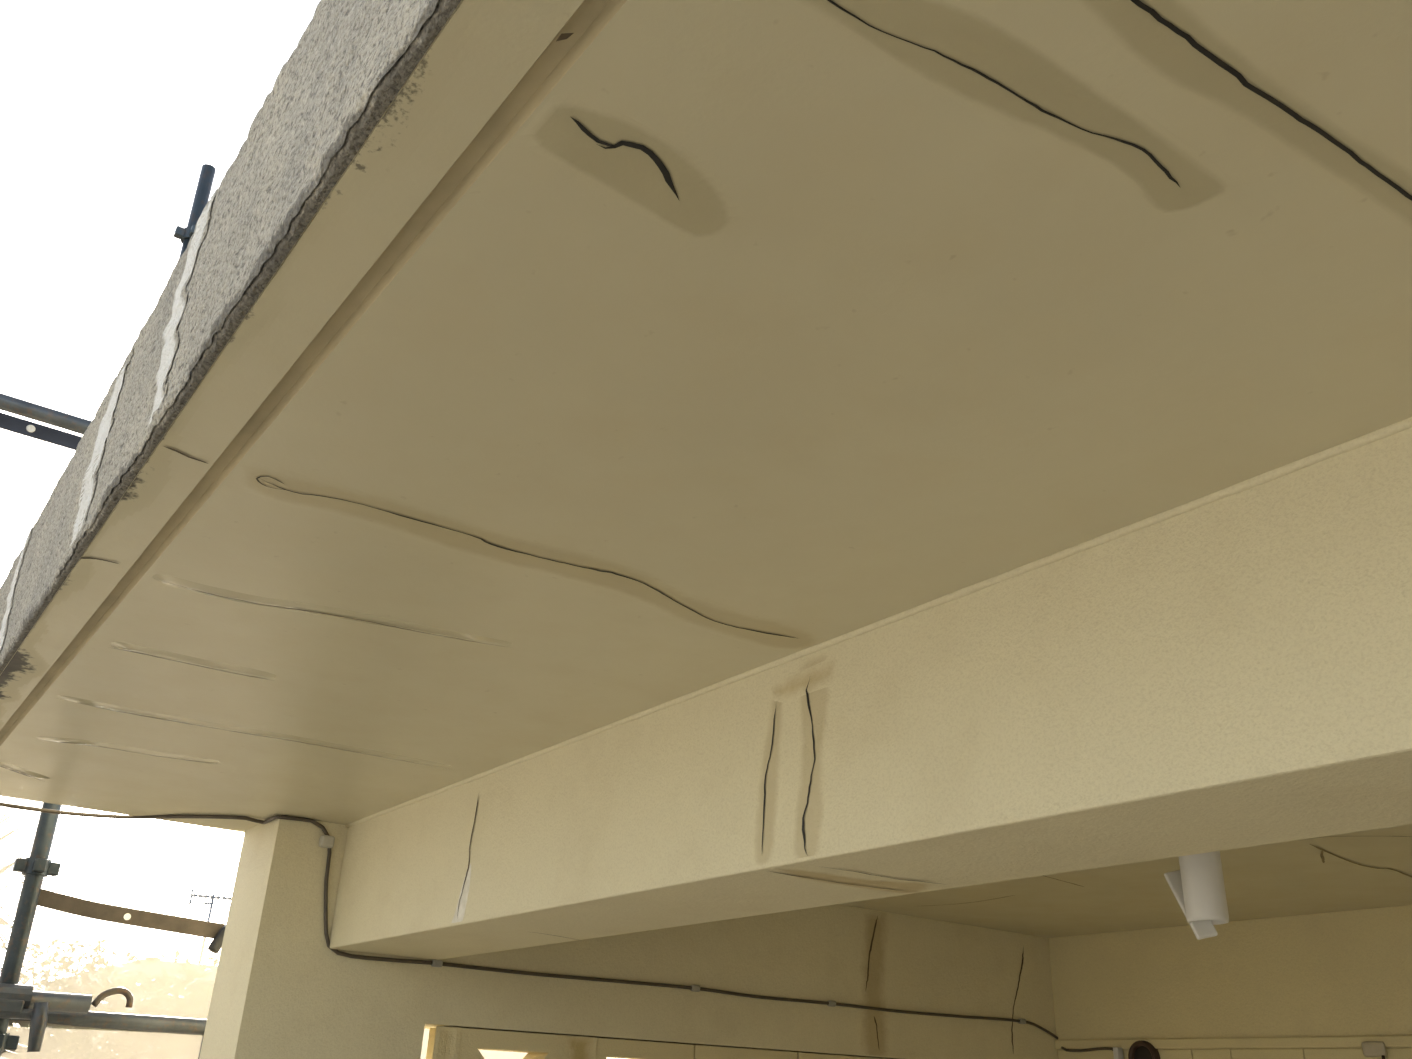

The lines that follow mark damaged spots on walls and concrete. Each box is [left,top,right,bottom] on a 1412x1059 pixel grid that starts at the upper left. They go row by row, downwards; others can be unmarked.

damp [0,0,497,727]
crack [514,87,749,248]
crack [764,0,1412,241]
crack [164,446,1013,924]